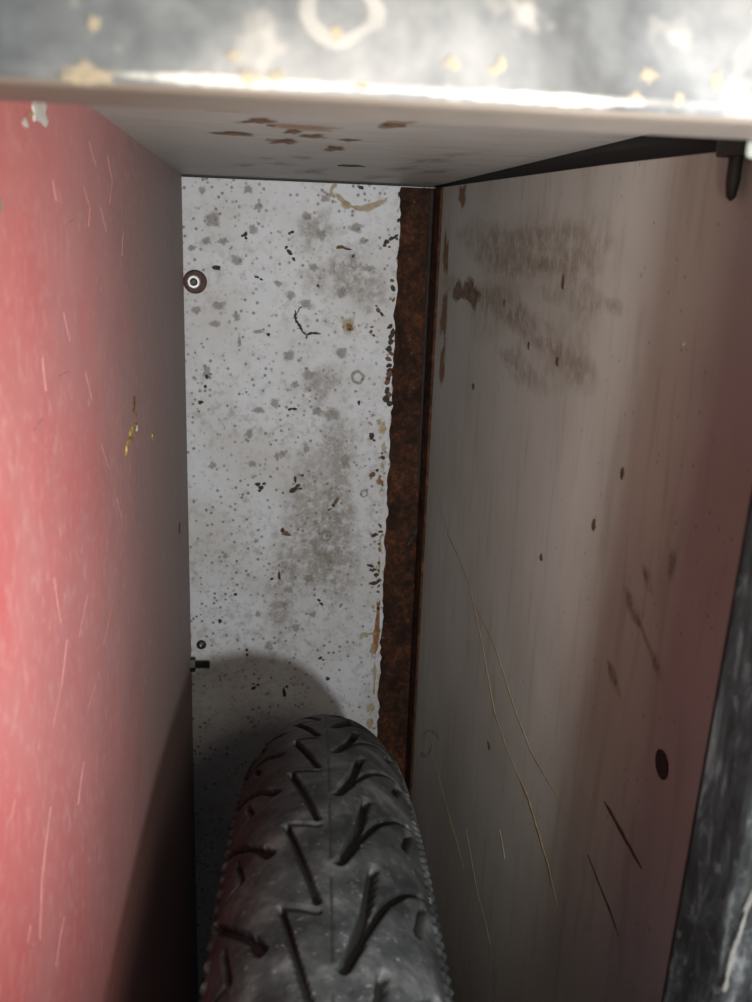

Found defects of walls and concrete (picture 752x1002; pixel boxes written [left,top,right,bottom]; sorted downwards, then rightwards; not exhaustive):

peeling [22,102,48,128]
corrosion [212,118,360,152]
corrosion [379,121,417,129]